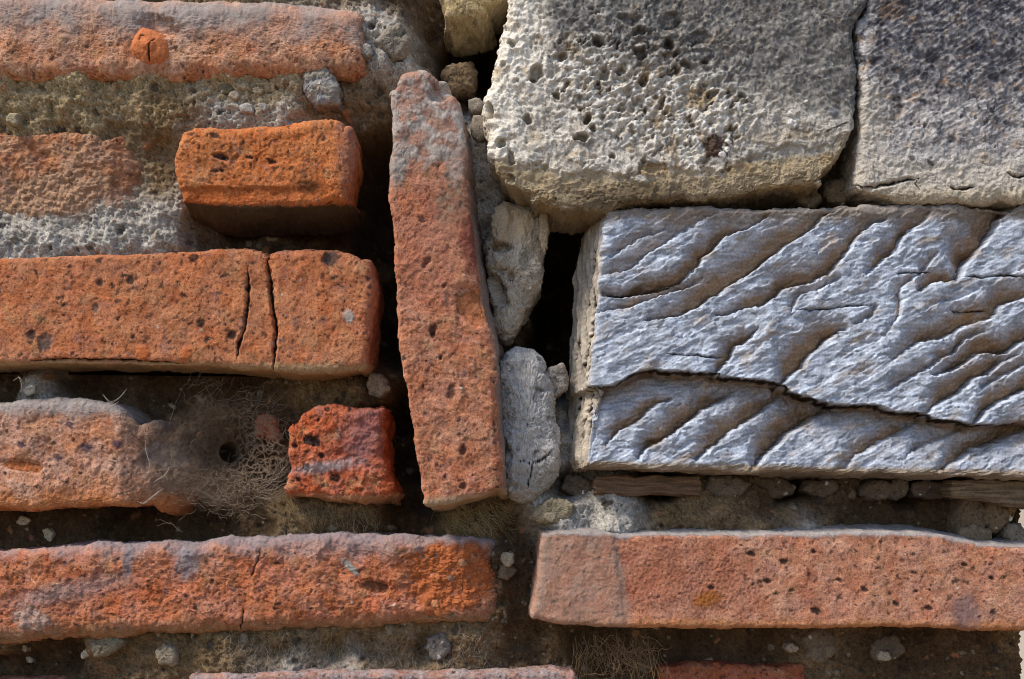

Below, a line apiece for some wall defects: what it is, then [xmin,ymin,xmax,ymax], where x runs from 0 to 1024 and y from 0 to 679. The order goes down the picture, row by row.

crack [237,257,278,368]
crack [574,251,1014,442]